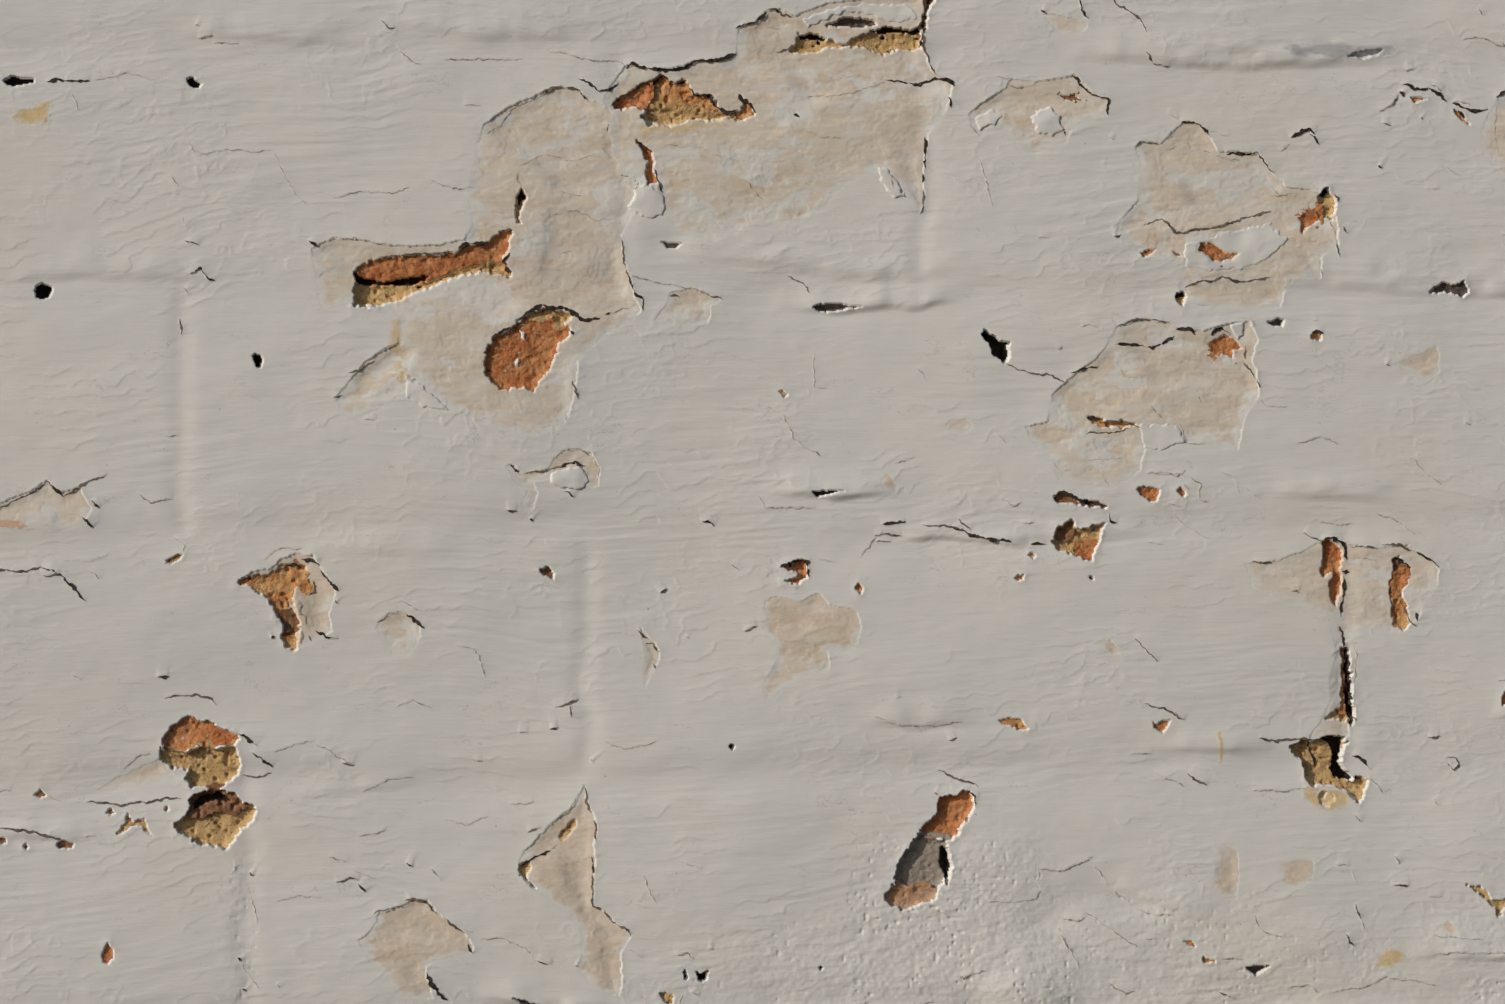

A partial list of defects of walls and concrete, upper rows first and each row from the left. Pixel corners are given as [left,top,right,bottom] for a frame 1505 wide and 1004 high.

peeling [969,75,1110,156]
peeling [309,0,955,435]
peeling [1026,113,1348,561]
flaking render [238,547,338,651]
peeling [745,559,860,702]
peeling [1246,514,1439,821]
crack [1331,627,1358,724]
peeling [107,809,150,834]
flaking render [159,716,272,849]
peeling [360,898,473,1001]
peeling [518,784,631,995]
flaking render [885,770,978,910]